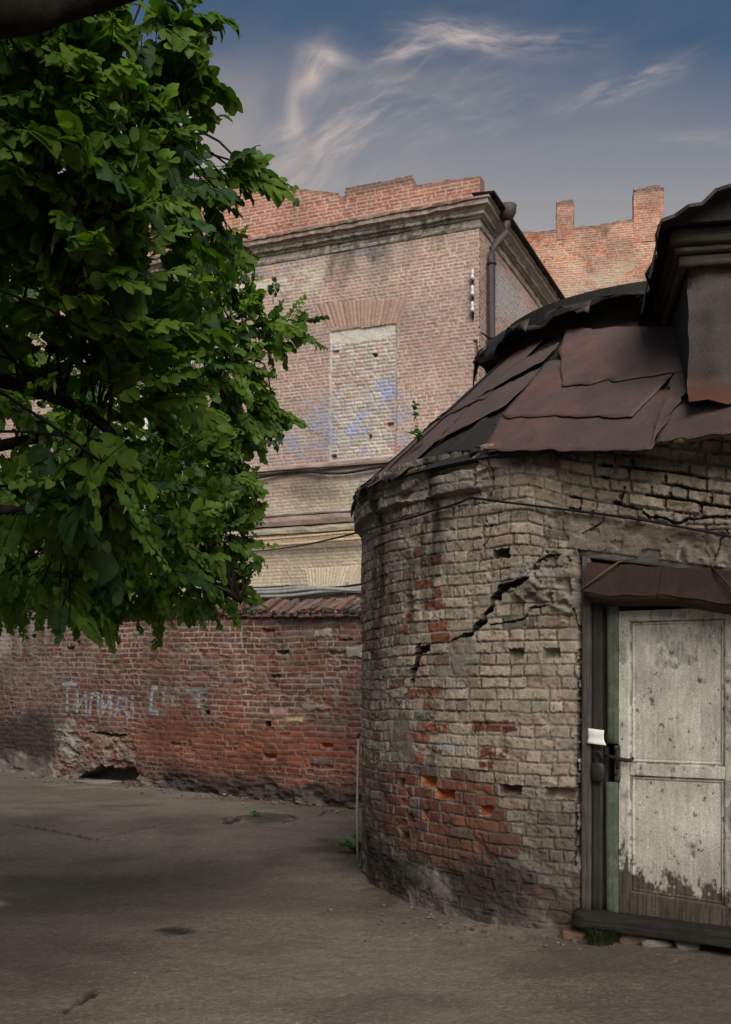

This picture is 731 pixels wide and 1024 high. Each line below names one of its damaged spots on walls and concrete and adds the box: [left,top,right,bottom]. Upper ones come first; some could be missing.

corrosion [688,392,731,404]
crack [568,453,731,562]
crack [382,553,562,818]
spalling [54,714,140,784]
peeling [630,857,725,905]